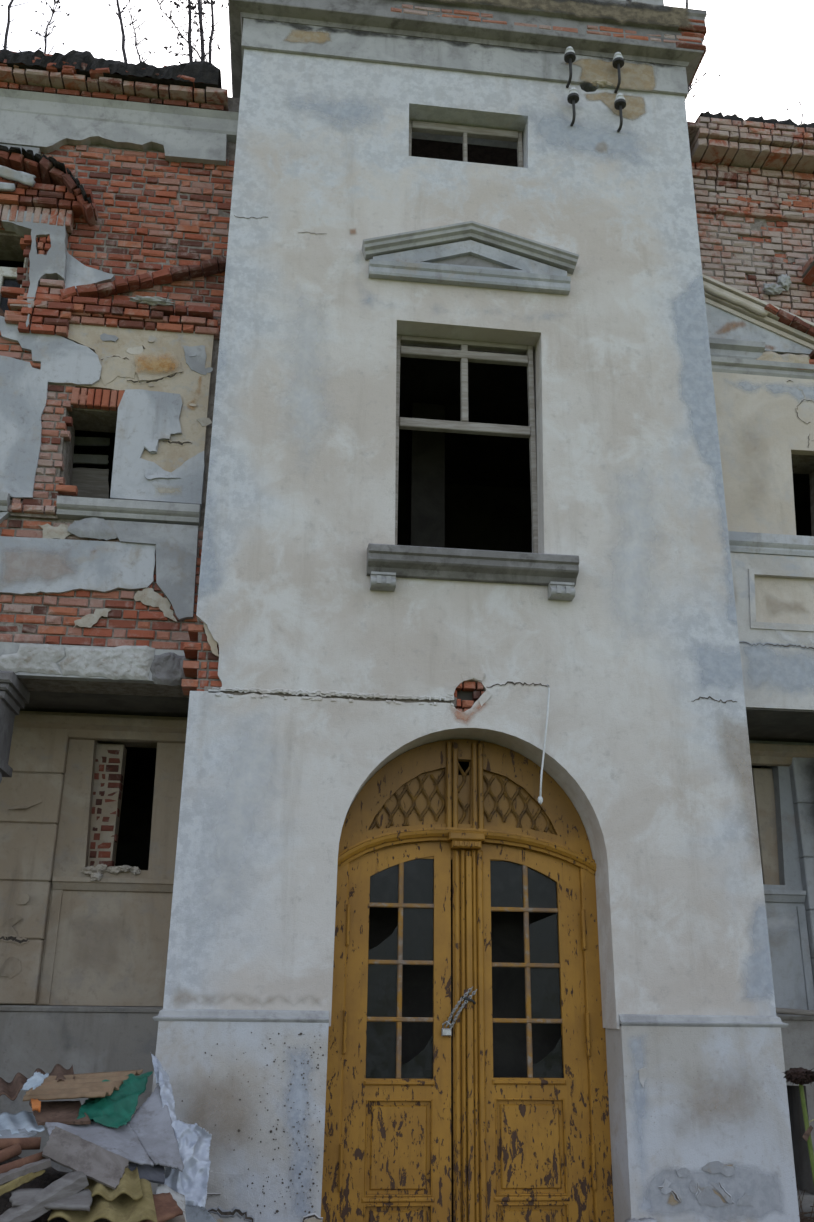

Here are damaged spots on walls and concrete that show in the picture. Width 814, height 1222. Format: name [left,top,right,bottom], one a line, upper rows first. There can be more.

flaking render [566,59,655,119]
flaking render [0,226,51,300]
flaking render [41,145,235,375]
flaking render [696,194,814,323]
flaking render [0,383,120,542]
damp [675,278,737,621]
crack [787,379,814,448]
flaking render [0,526,222,695]
crack [204,686,457,707]
spalling [448,673,492,712]
crack [487,681,549,689]
crack [692,695,737,704]